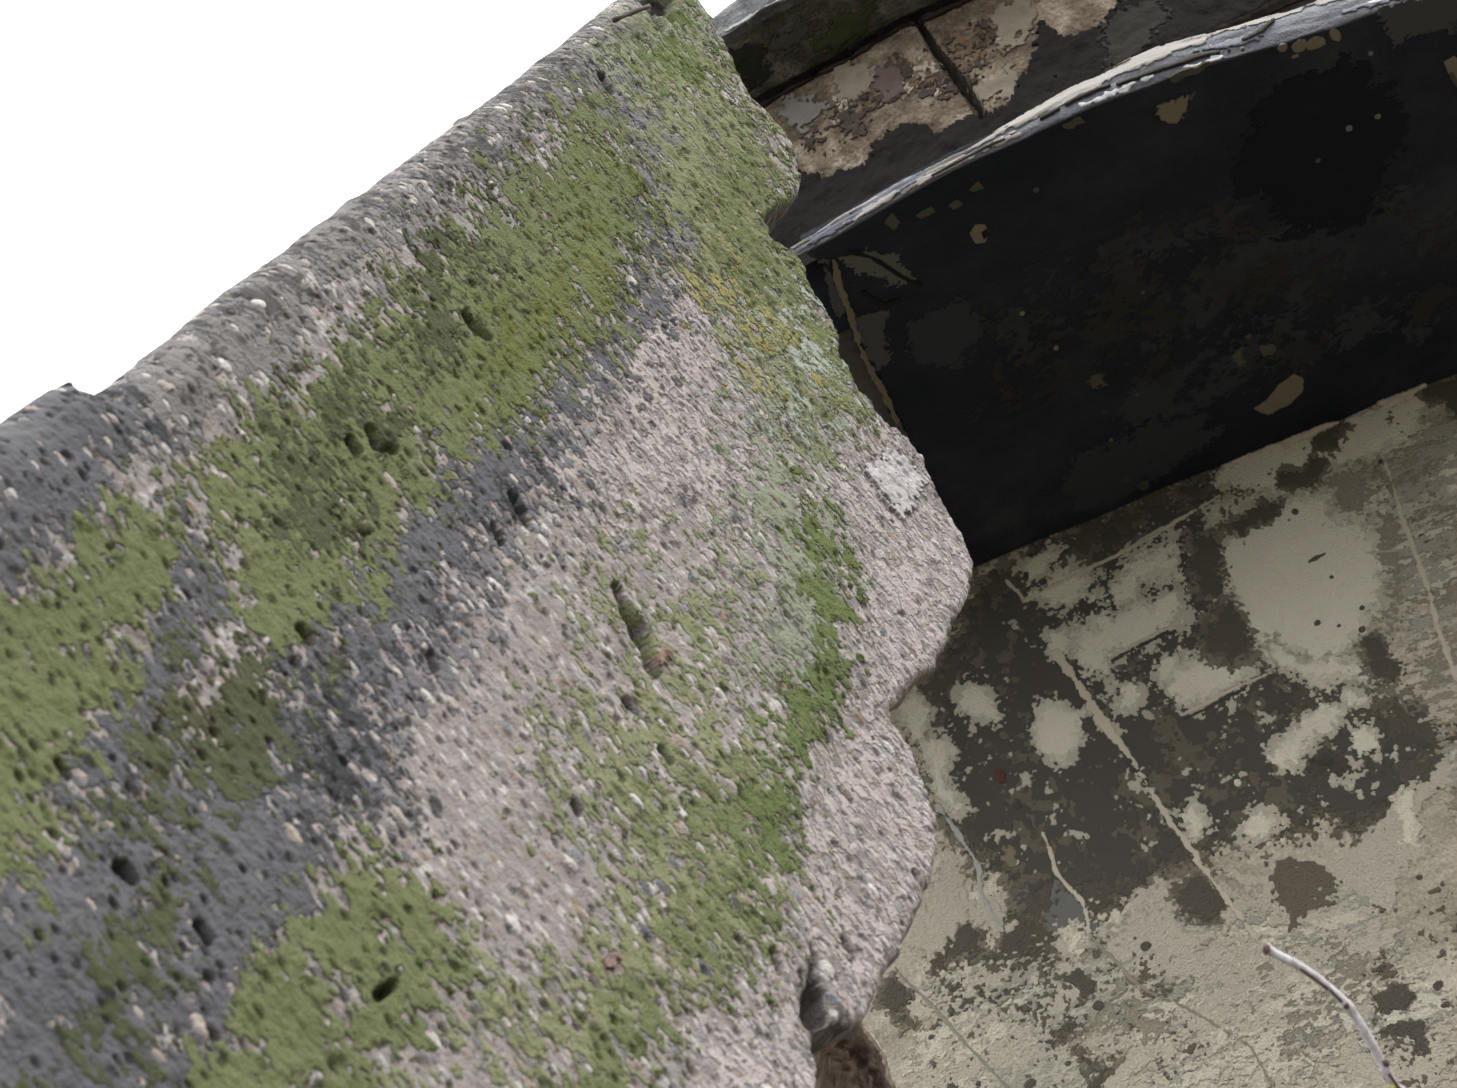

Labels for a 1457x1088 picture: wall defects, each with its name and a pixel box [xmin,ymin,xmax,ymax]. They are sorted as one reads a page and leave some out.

spalling [724,0,786,32]
peeling [778,0,1341,250]
peeling [1444,56,1457,79]
spalling [501,278,772,579]
peeling [1376,379,1457,415]
spalling [666,259,1343,1088]
water stain [870,374,1457,1088]
peeling [1233,605,1457,838]
crack [1380,455,1457,682]
peeling [1358,948,1457,1088]
peeling [1416,874,1457,964]